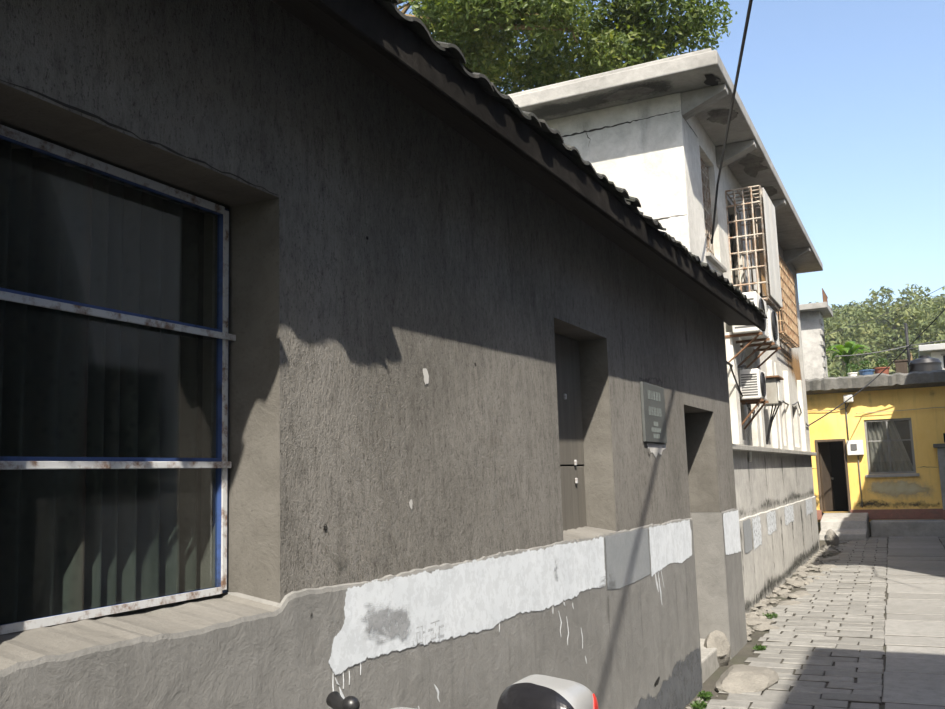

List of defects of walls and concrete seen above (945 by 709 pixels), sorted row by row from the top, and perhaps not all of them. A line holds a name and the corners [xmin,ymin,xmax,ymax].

crack [1,80,277,195]
crack [562,111,697,147]
water stain [636,649,702,709]